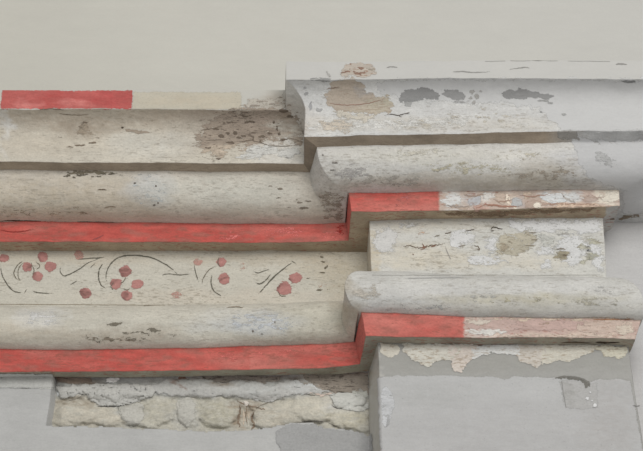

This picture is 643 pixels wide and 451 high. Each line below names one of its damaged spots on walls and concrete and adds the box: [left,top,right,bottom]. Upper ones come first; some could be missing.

peeling [319,62,394,134]
peeling [440,191,619,217]
peeling [495,230,570,261]
peeling [577,237,603,264]
peeling [380,316,635,373]
spalling [52,371,370,436]